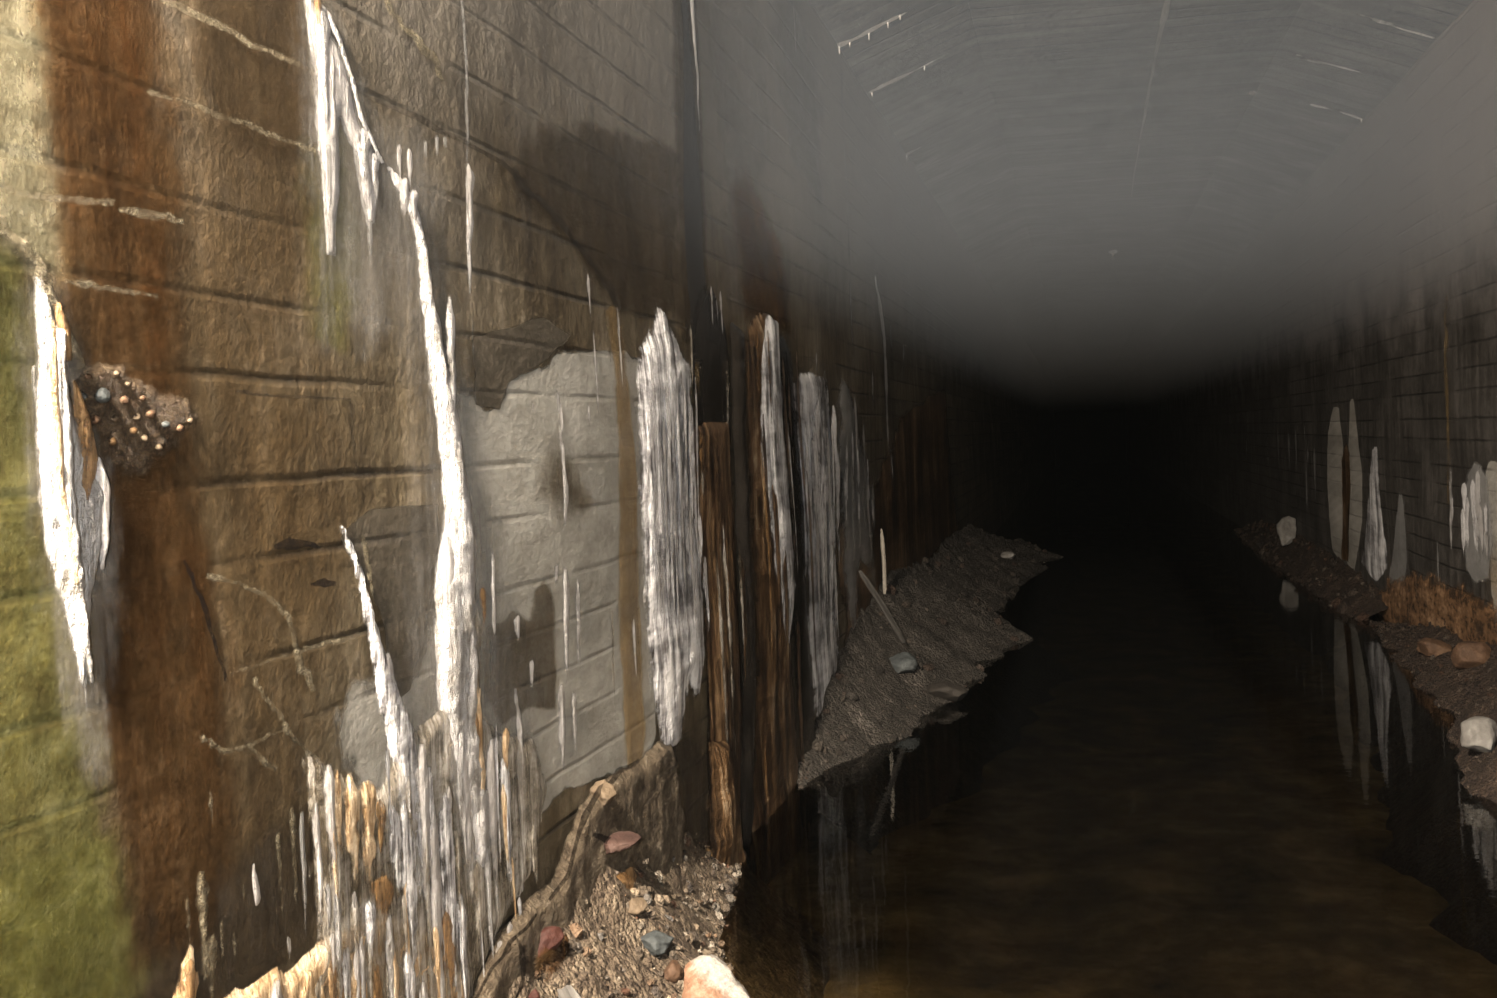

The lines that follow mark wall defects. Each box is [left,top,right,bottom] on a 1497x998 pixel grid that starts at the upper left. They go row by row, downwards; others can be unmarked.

leakage [0,0,111,697]
rust [54,0,175,401]
rust [106,439,222,938]
crack [184,560,361,770]
efflorescence [173,0,547,998]
peeling [341,683,402,815]
peeling [340,504,443,754]
peeling [429,778,466,885]
efflorescence [555,565,580,761]
peeling [456,317,685,998]
leakage [636,287,731,845]
efflorescence [794,353,875,715]